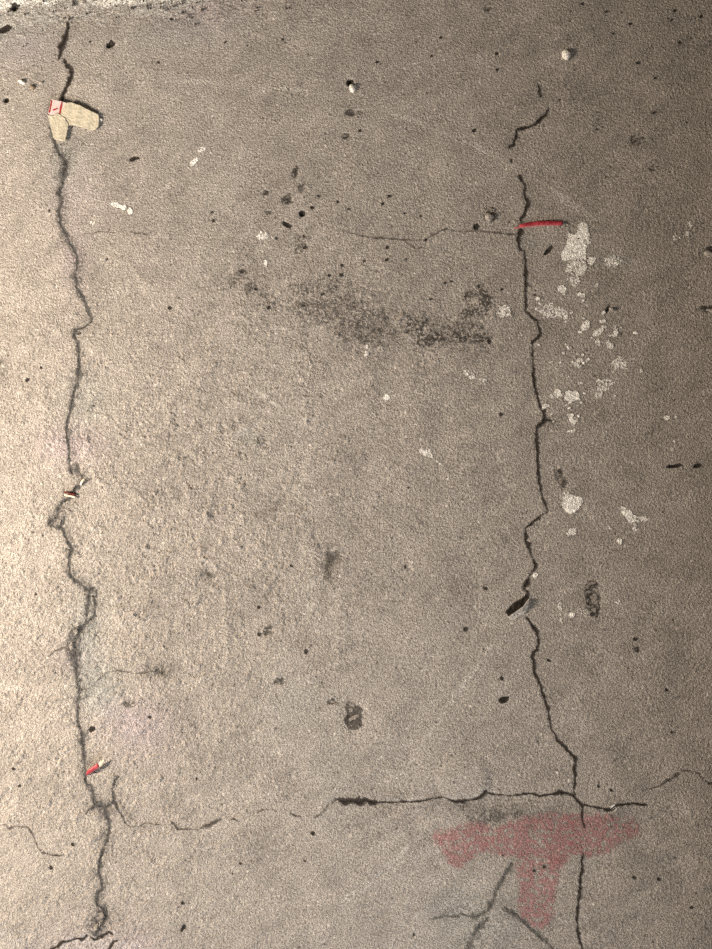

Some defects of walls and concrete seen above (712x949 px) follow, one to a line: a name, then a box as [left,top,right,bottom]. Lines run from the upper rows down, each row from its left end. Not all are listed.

crack [44,22,238,949]
crack [257,85,712,828]
crack [432,865,552,949]
crack [575,853,584,949]